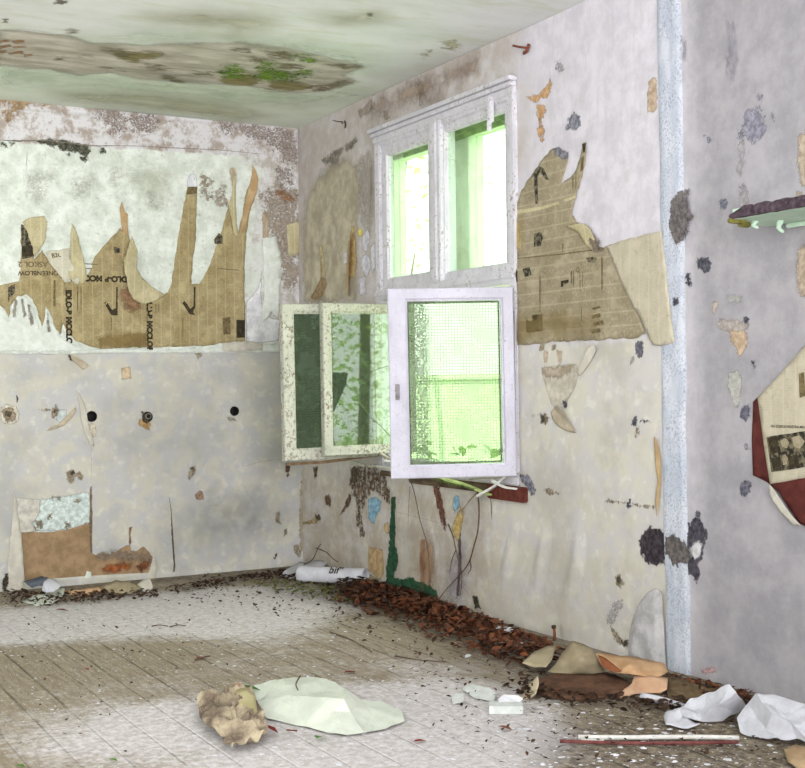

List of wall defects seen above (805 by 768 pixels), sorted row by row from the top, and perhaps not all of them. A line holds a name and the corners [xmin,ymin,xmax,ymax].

peeling [527,79,552,142]
leakage [36,138,106,162]
spalling [553,146,568,159]
spalling [187,174,228,207]
peeling [539,344,578,408]
leakage [356,502,365,537]